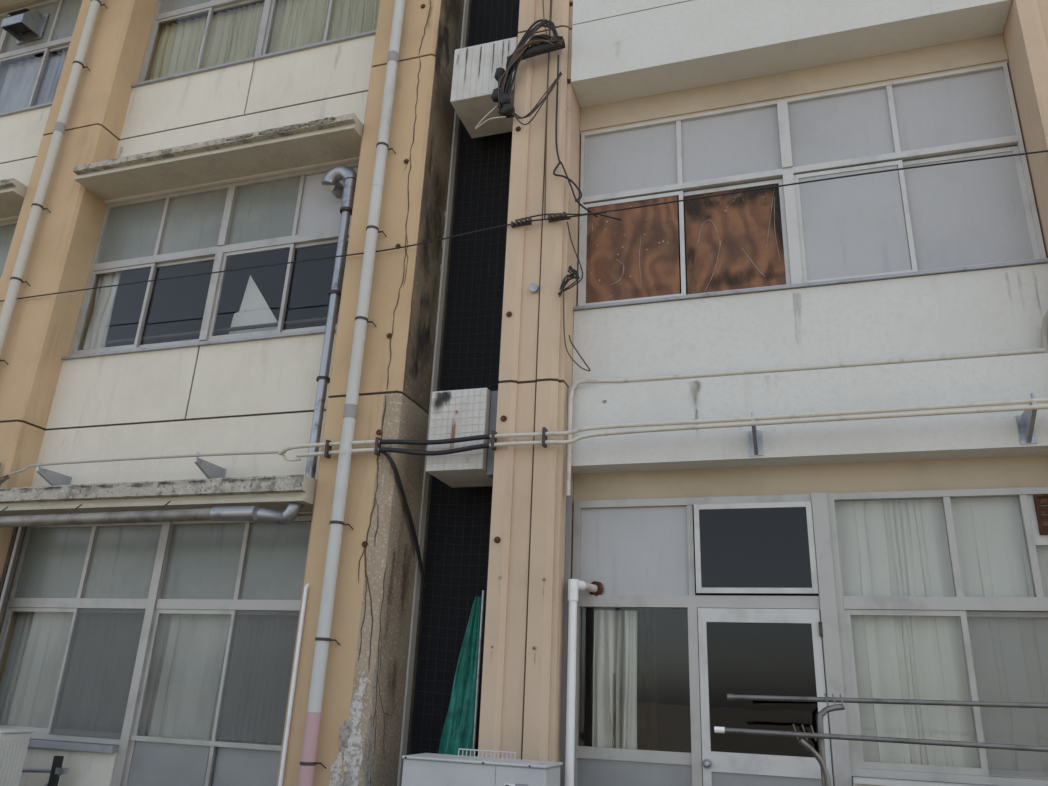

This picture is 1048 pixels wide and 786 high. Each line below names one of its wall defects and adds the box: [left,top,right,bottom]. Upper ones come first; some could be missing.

water stain [436,19,449,69]
crack [358,0,431,784]
water stain [435,392,450,408]
peeling [329,670,367,786]